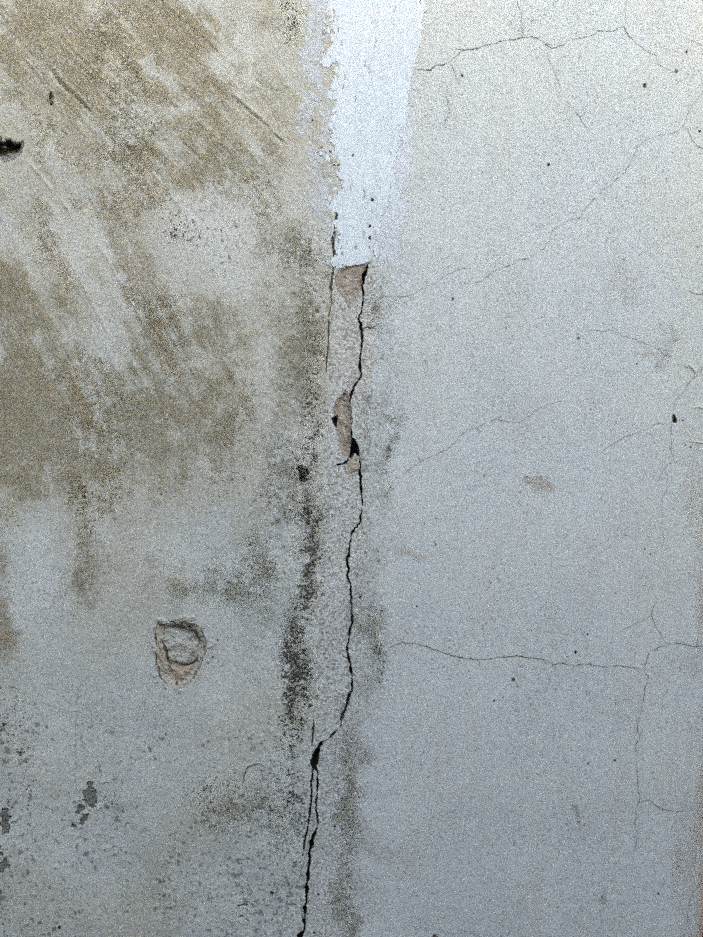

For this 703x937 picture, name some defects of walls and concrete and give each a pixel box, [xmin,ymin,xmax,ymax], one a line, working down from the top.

leakage [0,0,217,114]
crack [419,1,671,124]
hole [0,136,24,162]
spalling [335,262,367,308]
leakage [0,262,232,498]
spalling [331,389,360,474]
crack [272,93,703,937]
flaking render [150,637,198,695]
peeling [156,614,219,658]
leakage [183,330,326,895]
leakage [0,691,35,813]